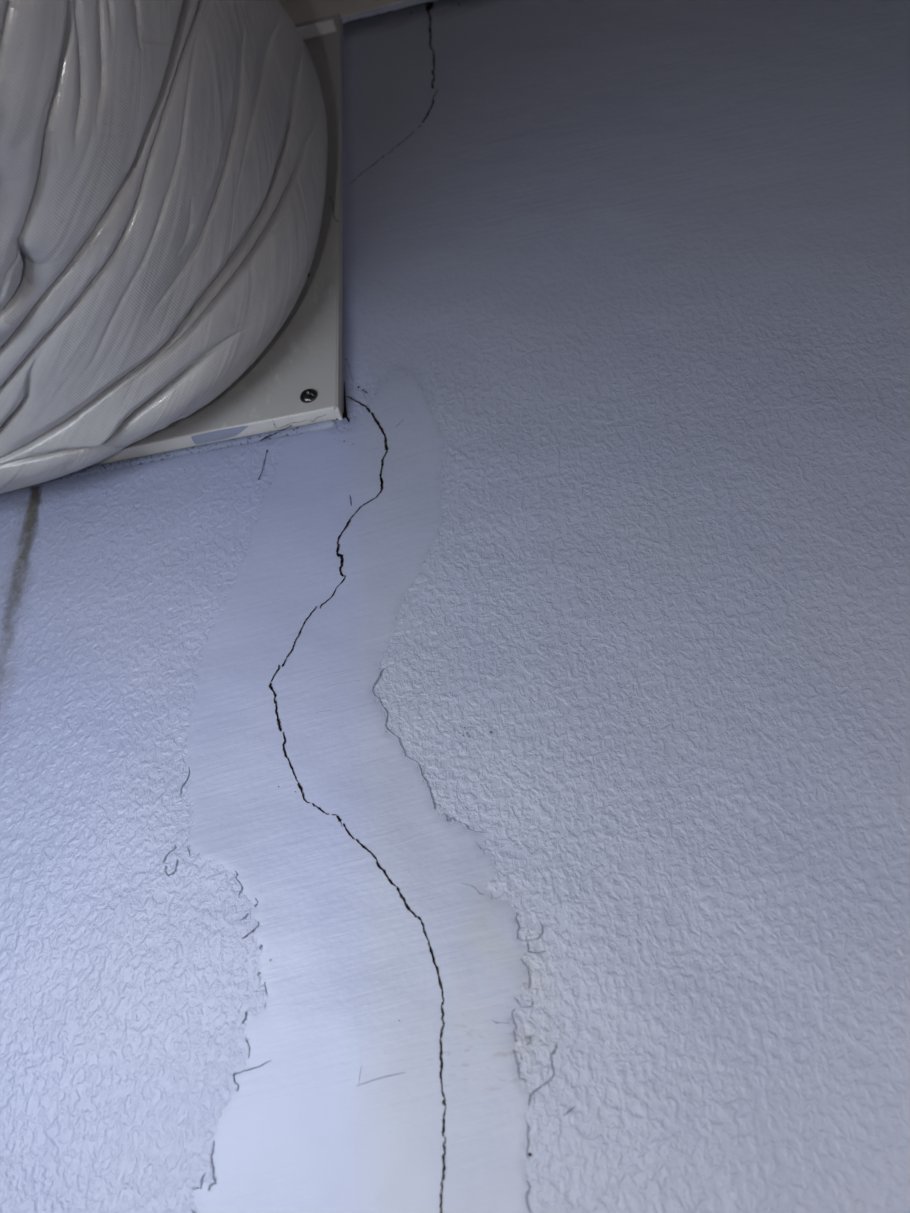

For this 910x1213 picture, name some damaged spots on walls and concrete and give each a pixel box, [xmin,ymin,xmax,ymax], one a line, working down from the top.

damp [13,486,40,588]
crack [258,396,446,1213]
peeling [372,668,491,852]
peeling [232,1038,271,1091]
peeling [492,913,556,1105]
peeling [191,1140,216,1191]